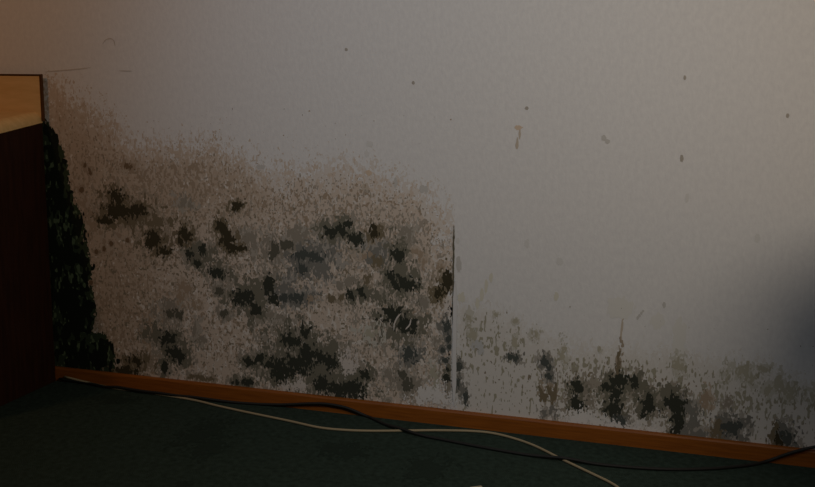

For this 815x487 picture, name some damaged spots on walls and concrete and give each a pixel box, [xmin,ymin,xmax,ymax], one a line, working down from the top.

leakage [33,70,815,448]